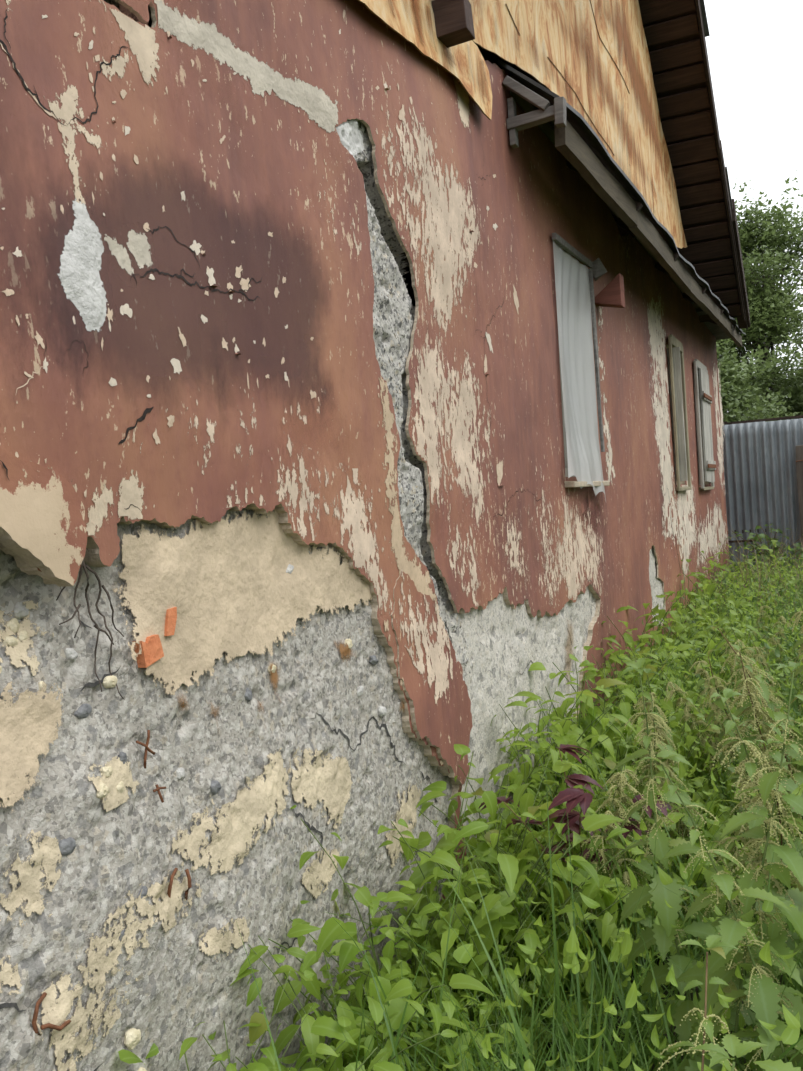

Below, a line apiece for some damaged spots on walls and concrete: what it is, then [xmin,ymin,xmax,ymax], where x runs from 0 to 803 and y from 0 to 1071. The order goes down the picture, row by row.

crack [0,10,130,129]
crack [104,0,144,24]
corrosion [413,0,429,43]
peeling [453,77,470,129]
corrosion [566,26,645,180]
corrosion [599,3,667,180]
crack [130,226,263,302]
crack [119,406,154,444]
crack [335,119,473,681]
peeling [647,296,729,626]
spalling [0,85,609,1071]